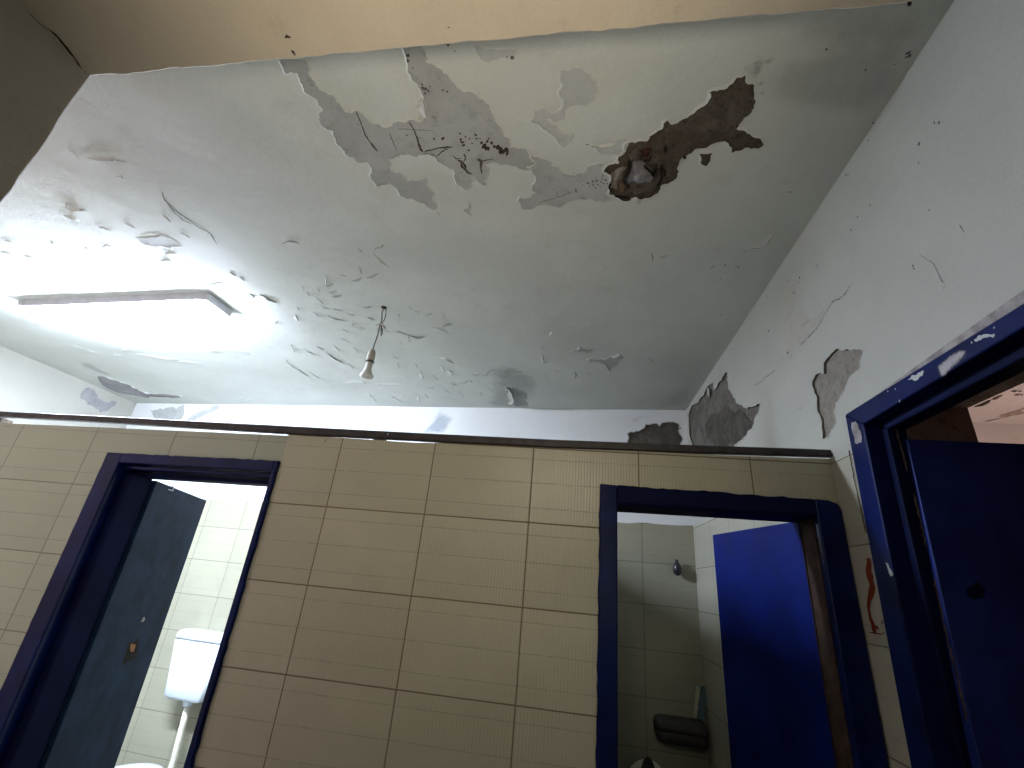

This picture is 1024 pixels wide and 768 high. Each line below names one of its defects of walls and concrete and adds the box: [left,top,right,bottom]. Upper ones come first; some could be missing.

crack [30,14,82,69]
peeling [277,46,766,218]
crack [162,193,217,244]
peeling [286,275,451,403]
peeling [939,327,995,375]
peeling [79,375,220,421]
peeling [417,357,529,407]
flaking render [627,371,762,455]
flaking render [812,347,864,440]
peeling [851,421,862,444]
peeling [975,390,1024,418]
rust [866,558,885,635]